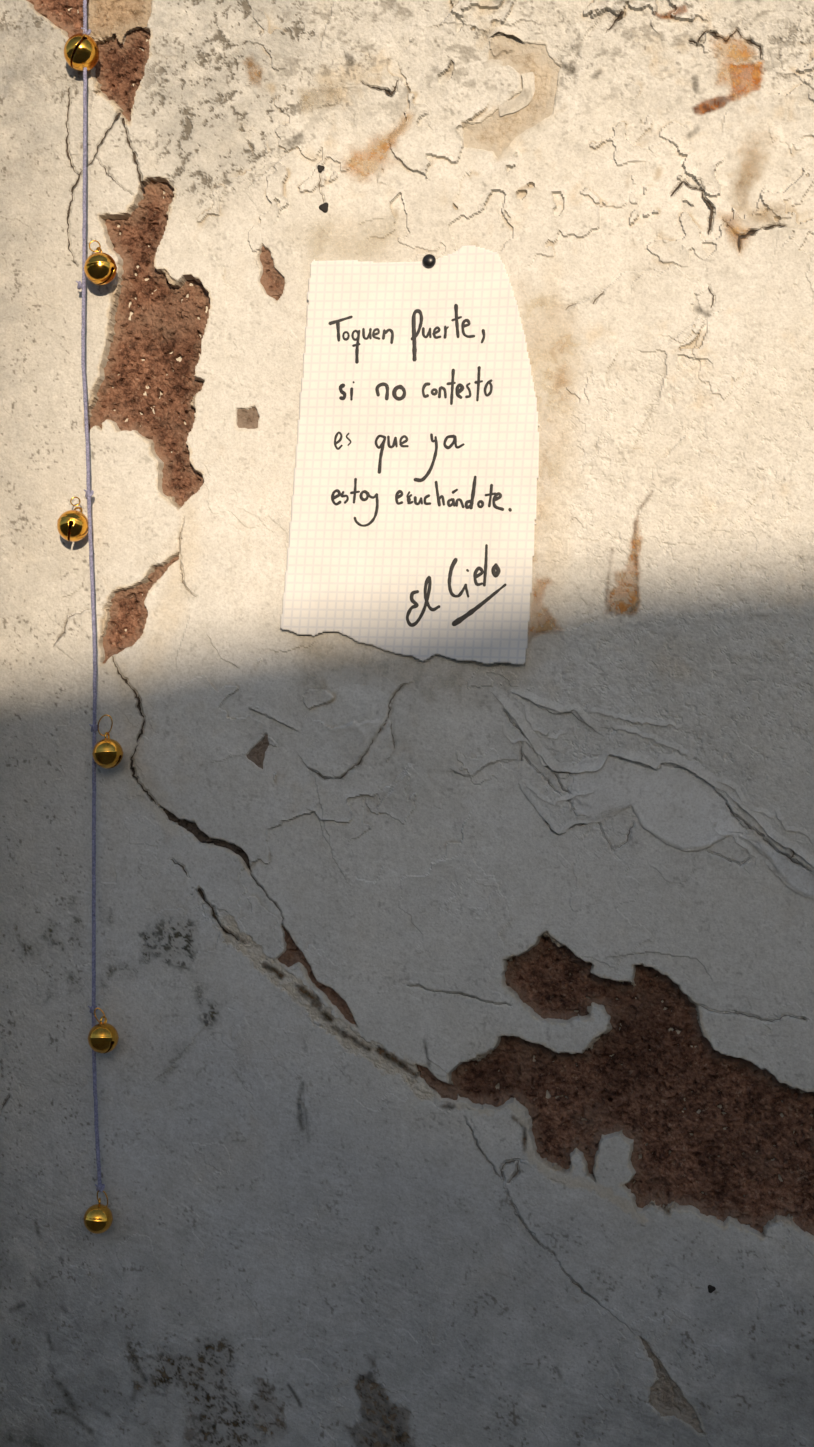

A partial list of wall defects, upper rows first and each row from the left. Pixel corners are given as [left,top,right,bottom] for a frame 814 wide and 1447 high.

spalling [26,0,89,38]
spalling [95,28,151,121]
rust [694,40,762,114]
flaking render [260,246,285,301]
spalling [89,180,210,507]
spalling [103,556,179,664]
crack [112,656,159,806]
crack [308,685,403,779]
crack [170,859,239,941]
crack [407,985,512,1006]
spalling [417,936,814,1236]
crack [464,1117,597,1302]